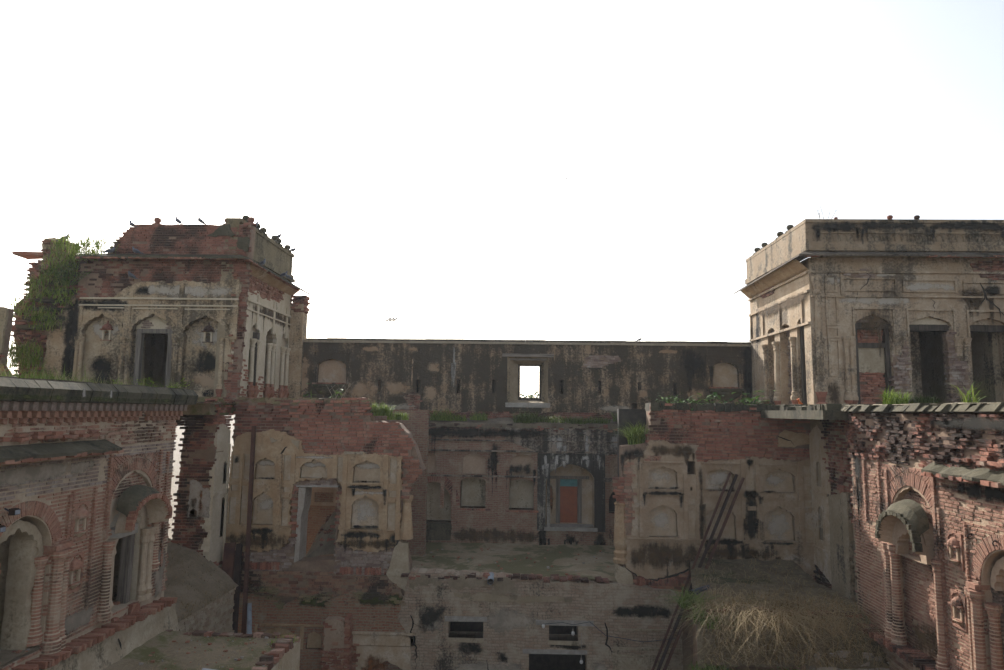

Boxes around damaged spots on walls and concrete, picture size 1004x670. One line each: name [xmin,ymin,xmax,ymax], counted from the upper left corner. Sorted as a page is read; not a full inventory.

leakage [812,221,1004,244]
leakage [62,299,128,380]
leakage [83,356,114,398]
leakage [194,352,216,373]
flaking render [75,259,418,459]